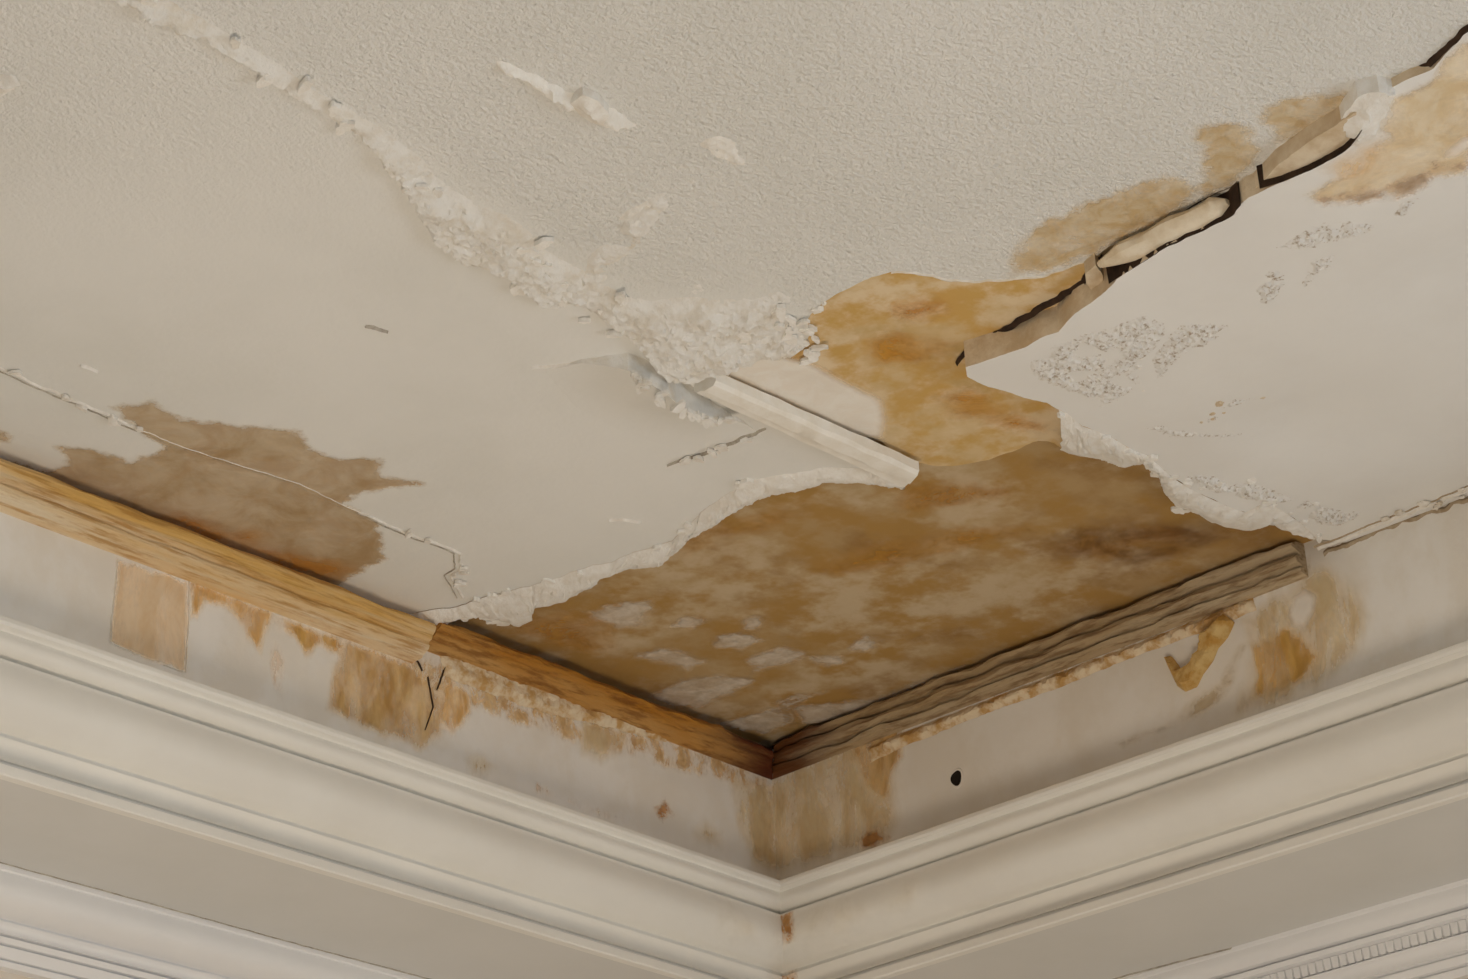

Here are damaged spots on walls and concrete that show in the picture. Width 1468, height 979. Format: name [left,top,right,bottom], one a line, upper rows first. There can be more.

leakage [1316,47,1468,204]
crack [1419,24,1468,67]
peeling [115,0,1375,556]
crack [993,130,1362,333]
leakage [12,403,422,585]
crack [0,367,469,599]
crack [416,660,446,730]
leakage [293,626,897,865]
spalling [410,467,998,642]
spalling [647,618,803,705]
spalling [724,686,913,731]
leakage [1255,575,1358,700]